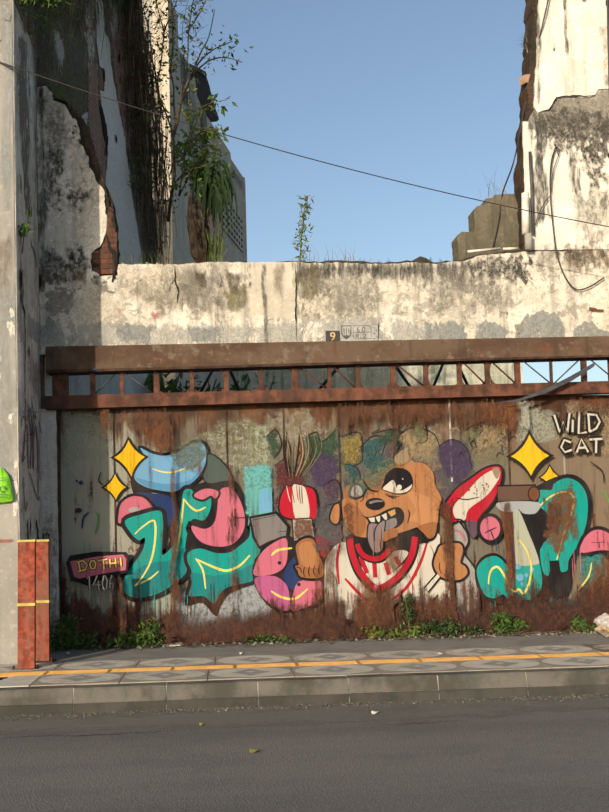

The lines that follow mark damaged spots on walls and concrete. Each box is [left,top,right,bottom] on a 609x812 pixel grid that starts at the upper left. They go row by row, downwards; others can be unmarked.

peeling [54,29,64,72]
damp [30,6,93,238]
flaking render [82,4,107,184]
flaking render [108,0,128,153]
damp [530,102,609,271]
peeling [532,90,609,149]
damp [40,246,94,285]
damp [261,265,280,341]
peeling [6,206,609,424]
damp [297,251,545,320]
rust [338,398,530,454]
rust [59,408,609,649]